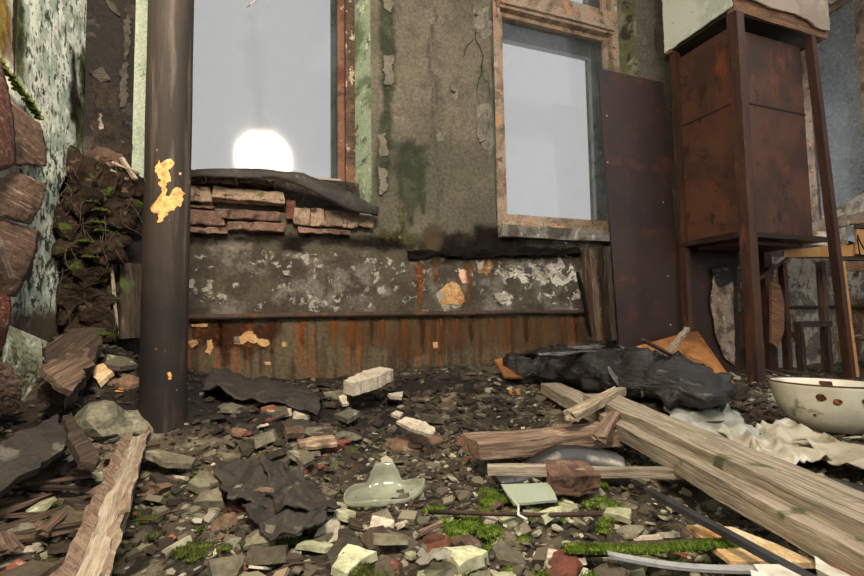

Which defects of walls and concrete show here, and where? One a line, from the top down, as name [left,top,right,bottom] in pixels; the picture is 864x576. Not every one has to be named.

water stain [58,49,85,149]
flaking render [89,0,133,156]
peeling [376,0,396,195]
crack [463,8,490,99]
peeling [150,159,185,223]
water stain [394,142,425,232]
peeling [276,270,316,305]
peeling [435,269,467,307]
peeling [476,240,580,306]